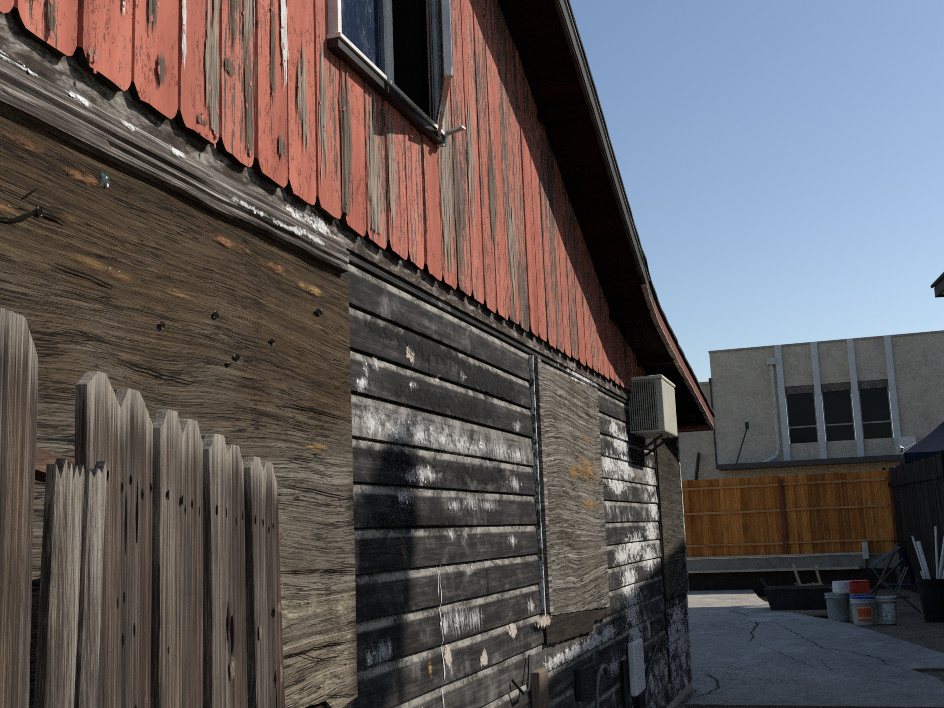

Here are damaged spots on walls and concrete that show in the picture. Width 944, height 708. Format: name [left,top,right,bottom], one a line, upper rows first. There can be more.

peeling [48,0,56,39]
peeling [149,0,160,31]
peeling [198,0,258,157]
peeling [271,0,355,214]
peeling [232,197,339,245]
peeling [365,95,397,234]
peeling [438,83,519,300]
damp [364,312,521,420]
peeling [558,365,604,391]
damp [355,443,512,485]
damp [356,509,479,536]
crack [730,610,910,707]